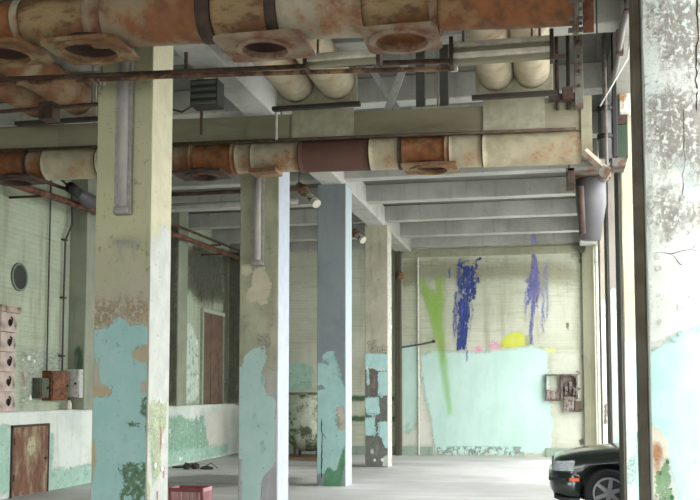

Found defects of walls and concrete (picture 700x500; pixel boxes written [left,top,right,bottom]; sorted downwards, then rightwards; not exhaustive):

peeling [44,46,228,500]
peeling [239,172,352,500]
spalling [365,229,392,467]
peeling [643,0,700,500]
crack [678,0,700,194]